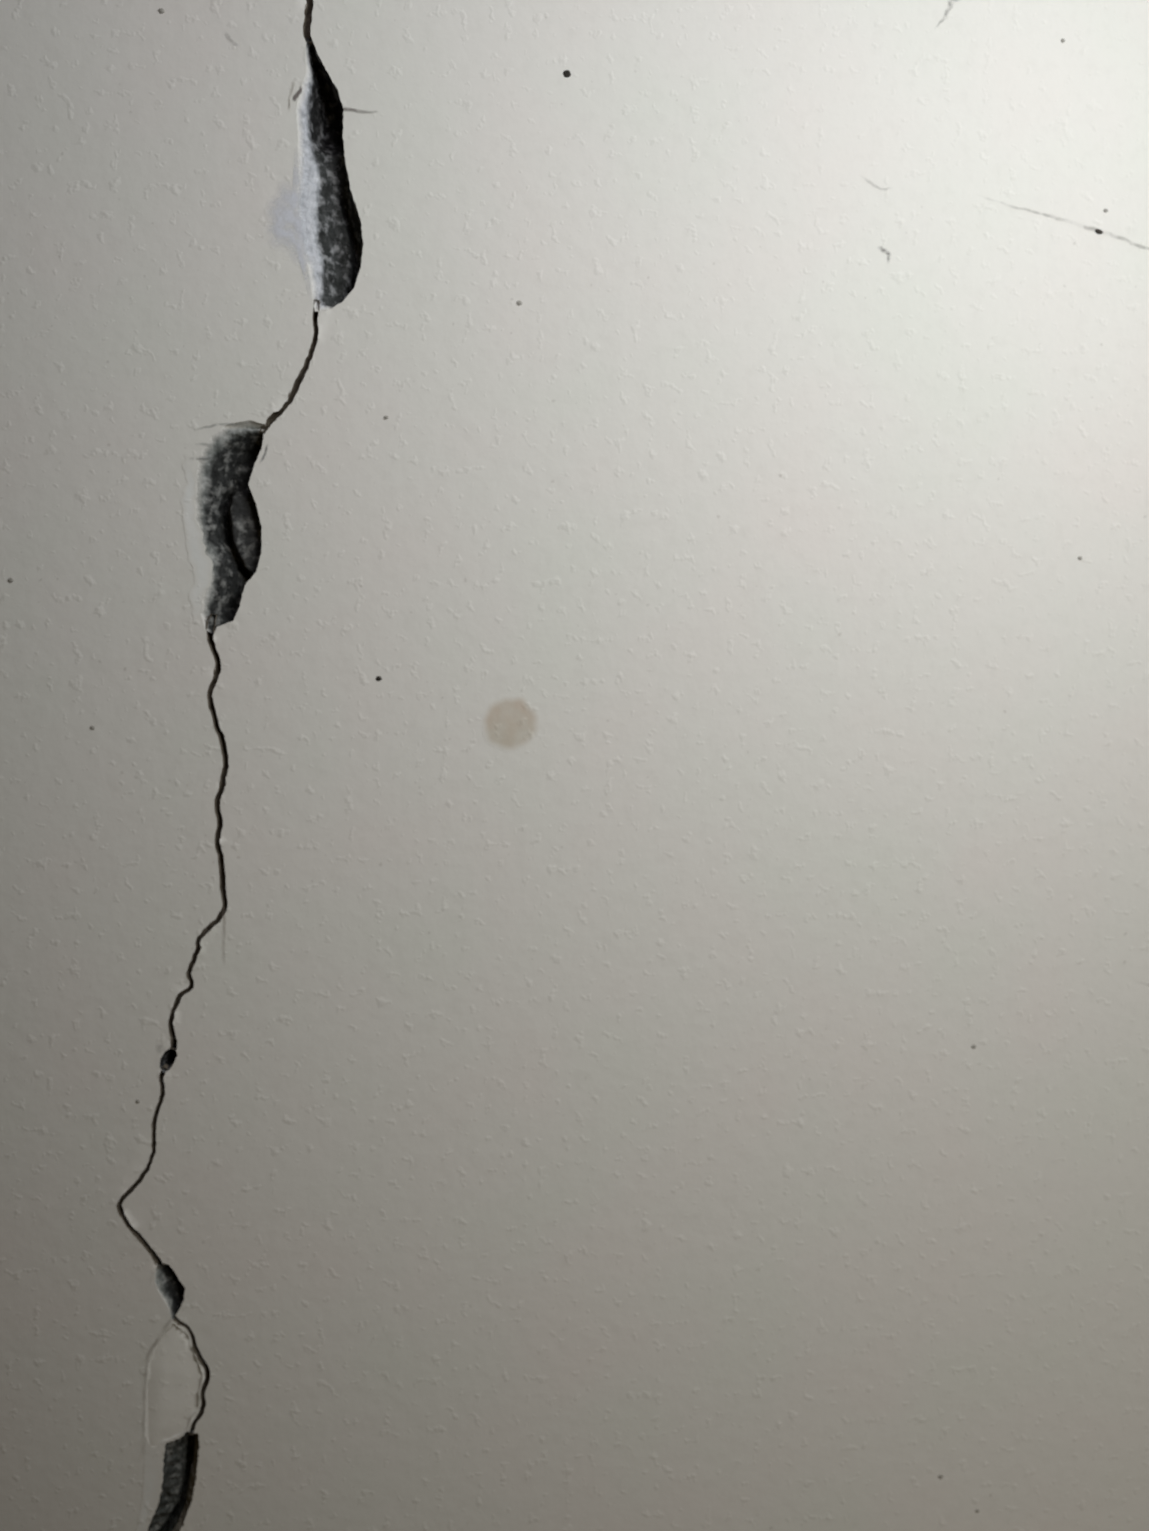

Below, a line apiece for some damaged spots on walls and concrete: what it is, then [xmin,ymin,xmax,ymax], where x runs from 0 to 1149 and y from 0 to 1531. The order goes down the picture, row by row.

crack [303,0,314,45]
spalling [274,37,363,312]
crack [260,299,320,434]
spalling [180,420,267,634]
crack [116,614,229,1268]
flaking render [136,1263,203,1531]
crack [173,1315,210,1435]